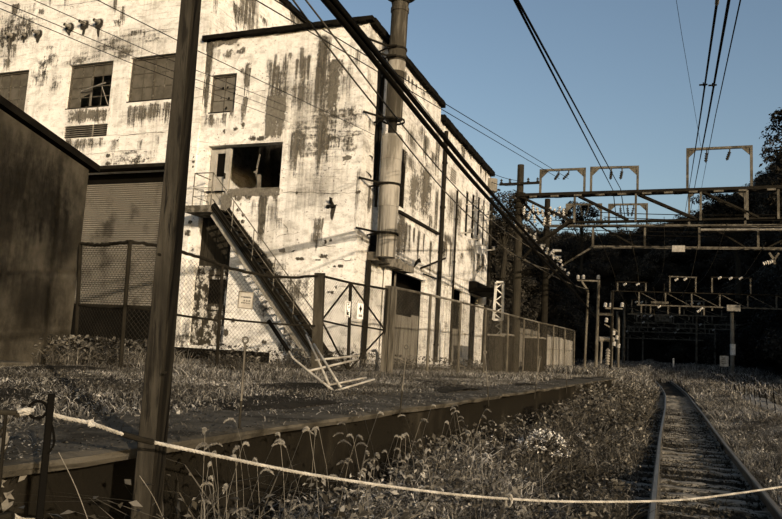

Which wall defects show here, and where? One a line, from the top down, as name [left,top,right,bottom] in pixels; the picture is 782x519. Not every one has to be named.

water stain [0,3,33,69]
water stain [233,0,267,30]
water stain [127,102,171,127]
water stain [201,42,234,126]
water stain [267,34,382,211]
water stain [404,124,440,175]
water stain [243,196,308,305]
water stain [311,218,324,248]
water stain [396,190,485,281]